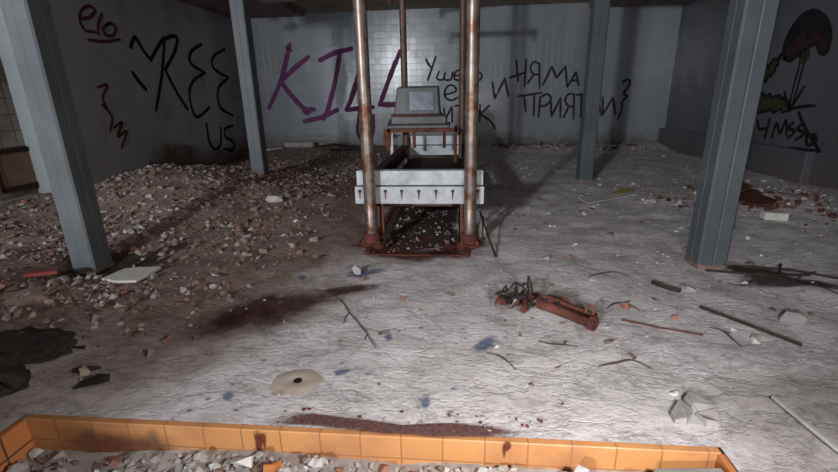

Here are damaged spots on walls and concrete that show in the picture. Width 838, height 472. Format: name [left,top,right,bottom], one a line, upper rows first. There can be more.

corrosion [355,244,479,261]